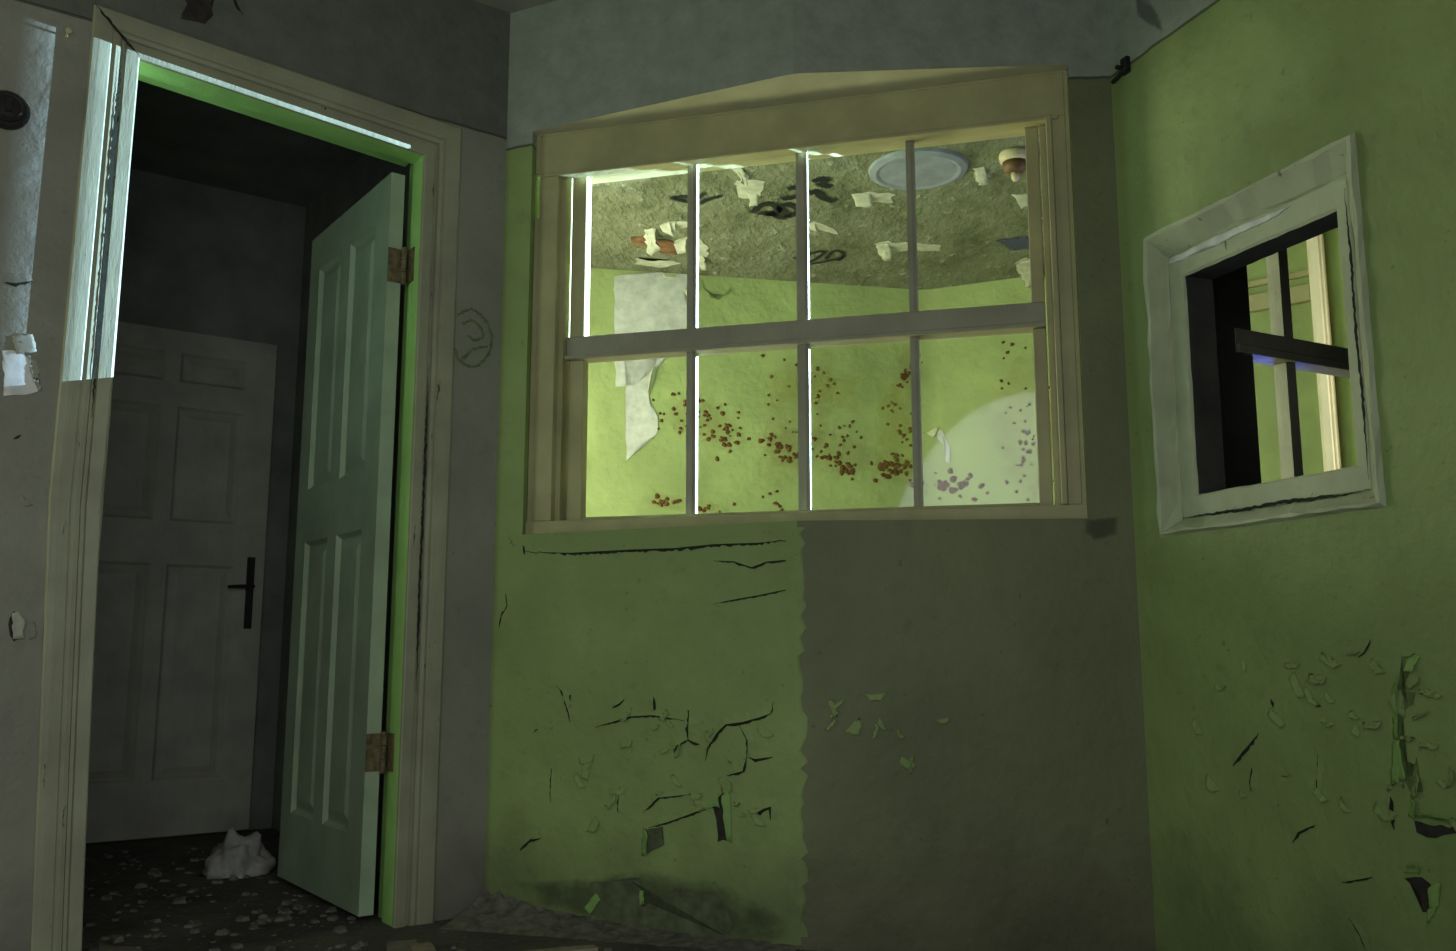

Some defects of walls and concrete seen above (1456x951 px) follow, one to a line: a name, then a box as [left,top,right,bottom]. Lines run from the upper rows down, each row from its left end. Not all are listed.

crack [515,531,797,604]
peeling [1390,655,1456,838]
spalling [641,826,664,856]
spalling [696,792,731,843]
peeling [1404,864,1441,928]